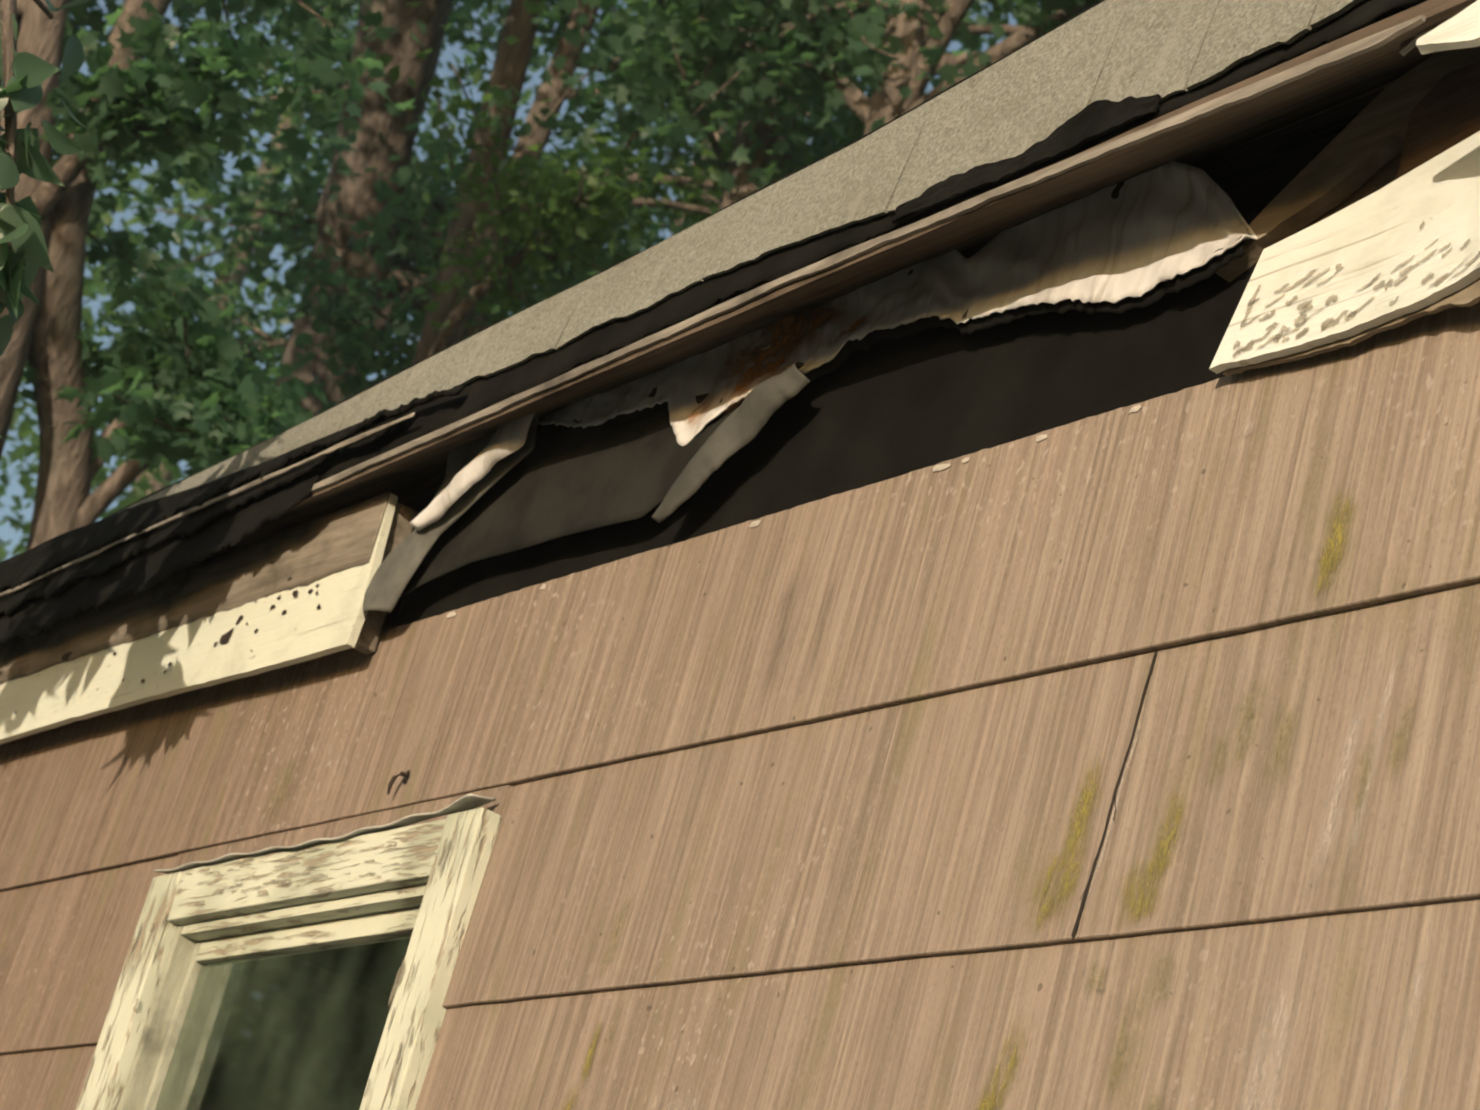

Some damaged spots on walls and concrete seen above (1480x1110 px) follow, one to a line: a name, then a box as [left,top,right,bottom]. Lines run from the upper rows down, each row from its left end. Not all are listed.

corrosion [724,301,867,394]
spalling [933,457,970,471]
peeling [197,847,333,896]
leakage [1037,773,1097,924]
crack [1071,651,1157,937]
peeling [388,959,414,1097]